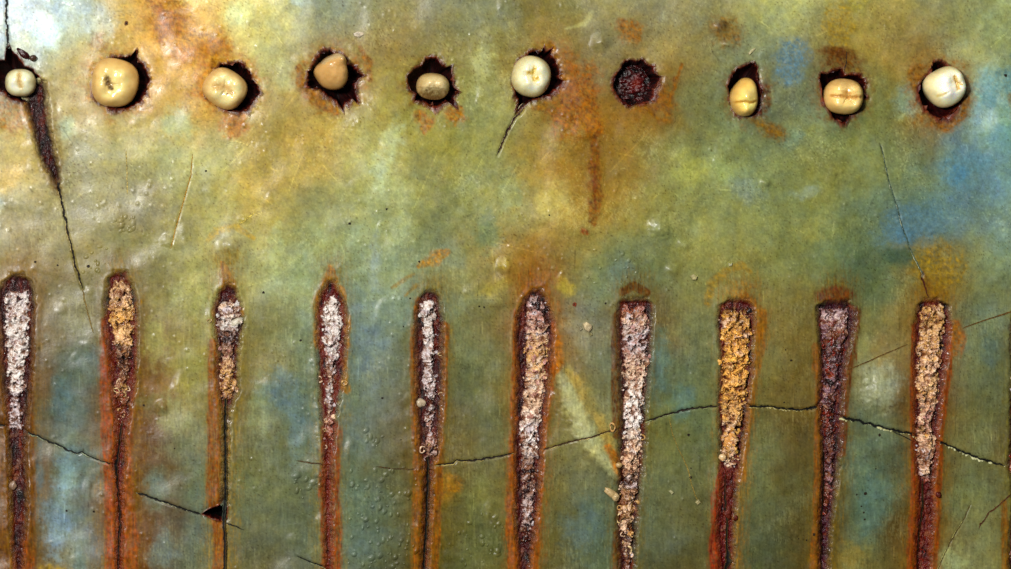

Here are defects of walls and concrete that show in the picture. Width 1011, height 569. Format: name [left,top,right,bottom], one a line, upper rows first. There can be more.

rust [0,0,472,200]
crack [497,103,524,155]
rust [516,27,689,238]
crack [57,182,94,333]
rust [0,240,159,569]
crack [28,399,244,569]
rust [191,235,258,569]
rust [299,237,365,569]
crack [376,453,514,569]
rust [493,245,574,569]
crack [749,403,817,412]
crack [839,416,1005,467]